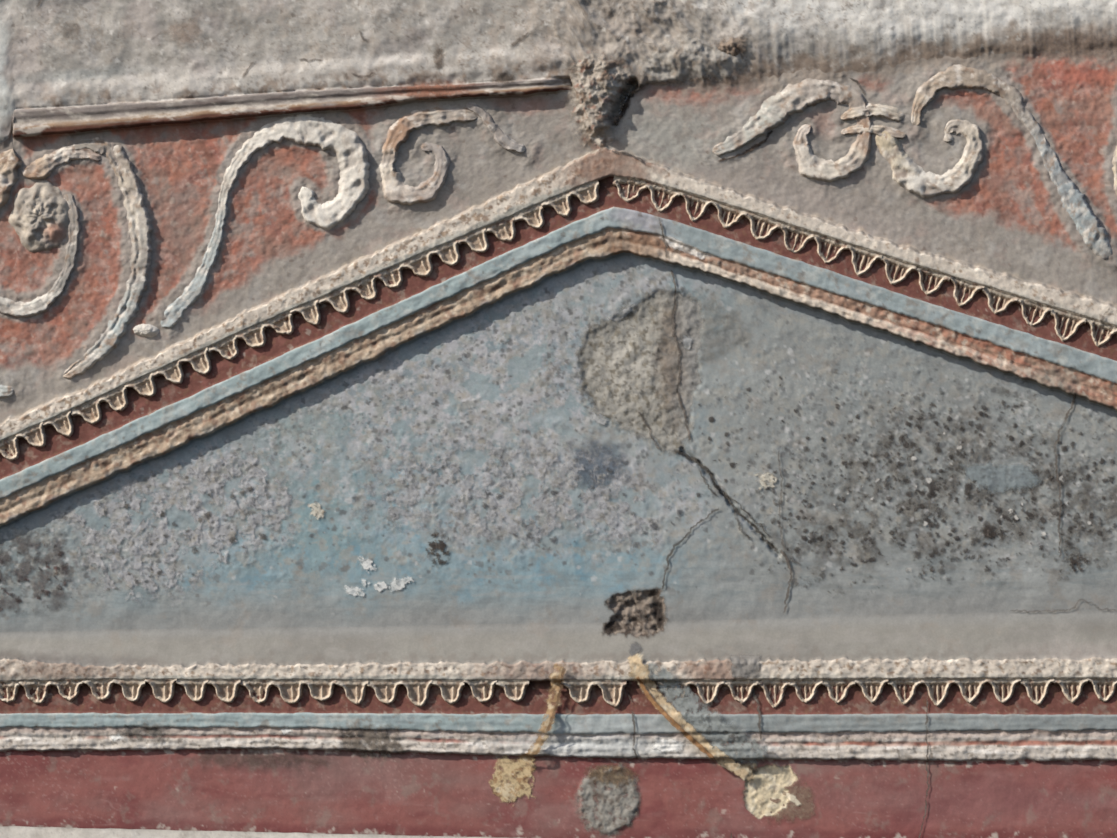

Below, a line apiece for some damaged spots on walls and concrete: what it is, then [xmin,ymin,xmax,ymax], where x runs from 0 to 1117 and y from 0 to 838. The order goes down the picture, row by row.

spalling [616,80,642,126]
damp [0,537,72,609]
damp [71,454,291,595]
spalling [603,588,667,656]
spalling [576,288,703,454]
crack [639,218,798,612]
damp [762,391,1117,578]
crack [1051,389,1076,556]
crack [919,689,930,838]